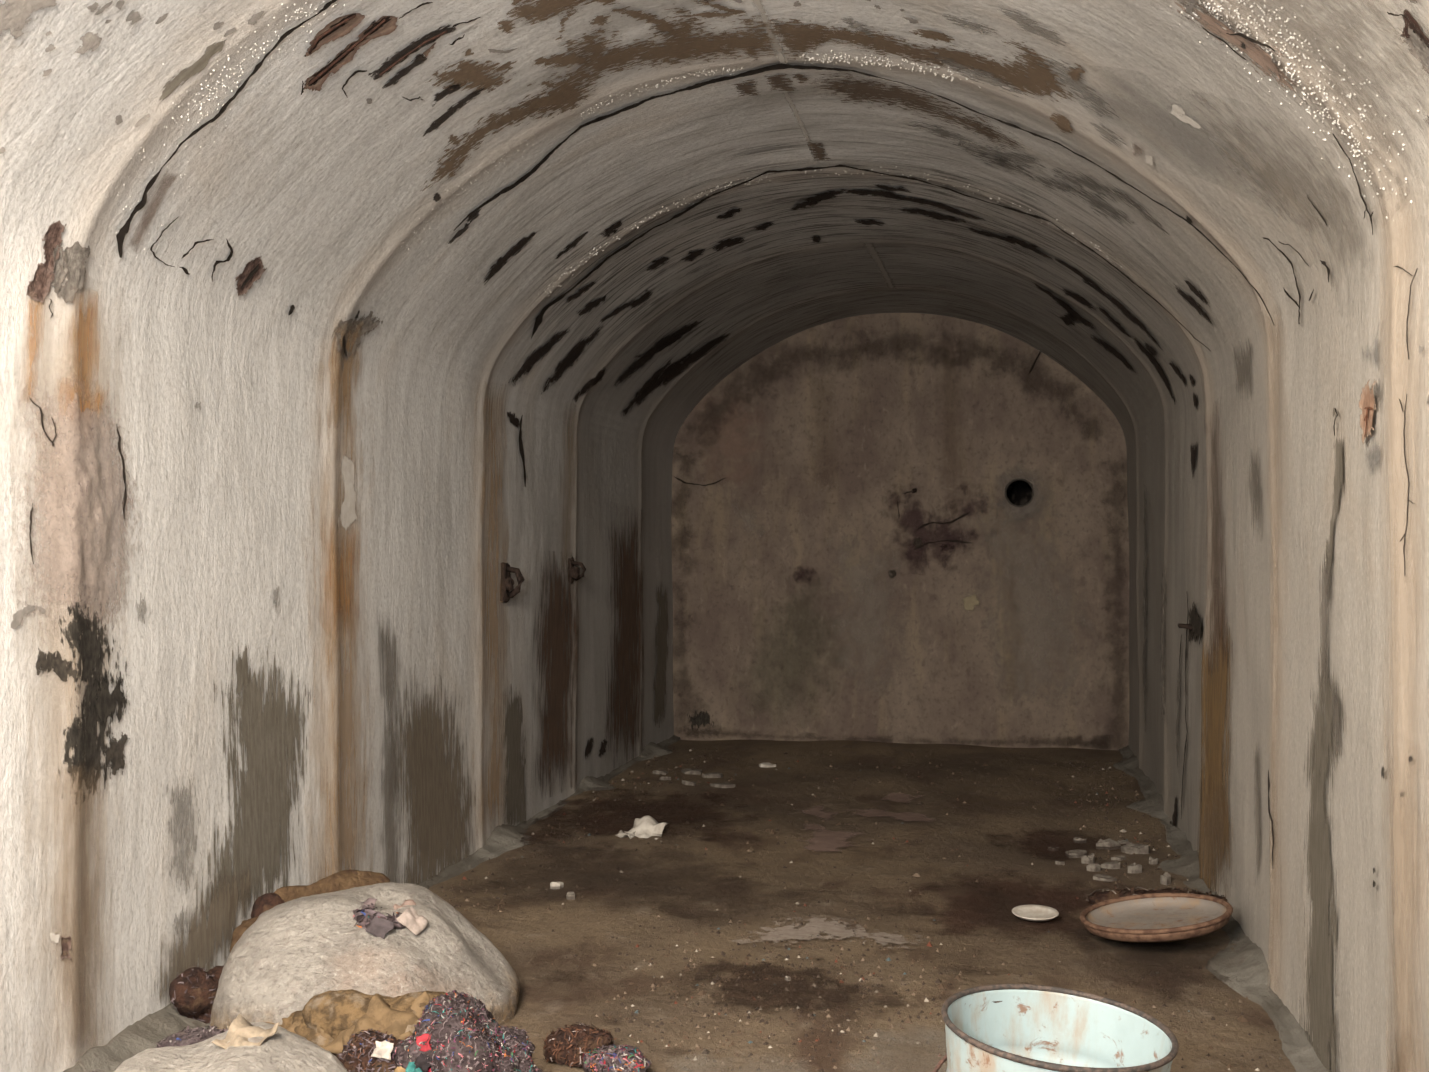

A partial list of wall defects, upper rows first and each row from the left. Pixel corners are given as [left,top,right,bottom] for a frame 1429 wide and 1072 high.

flaking render [26,220,90,318]
rust [77,305,96,398]
crack [116,0,337,282]
spalling [301,2,433,95]
peeling [368,0,1085,202]
crack [453,63,1330,349]
crack [1399,394,1415,576]
water stain [36,594,130,804]
water stain [159,644,311,1003]
rust [325,526,365,878]
rust [1197,606,1233,900]
water stain [1299,408,1347,1072]